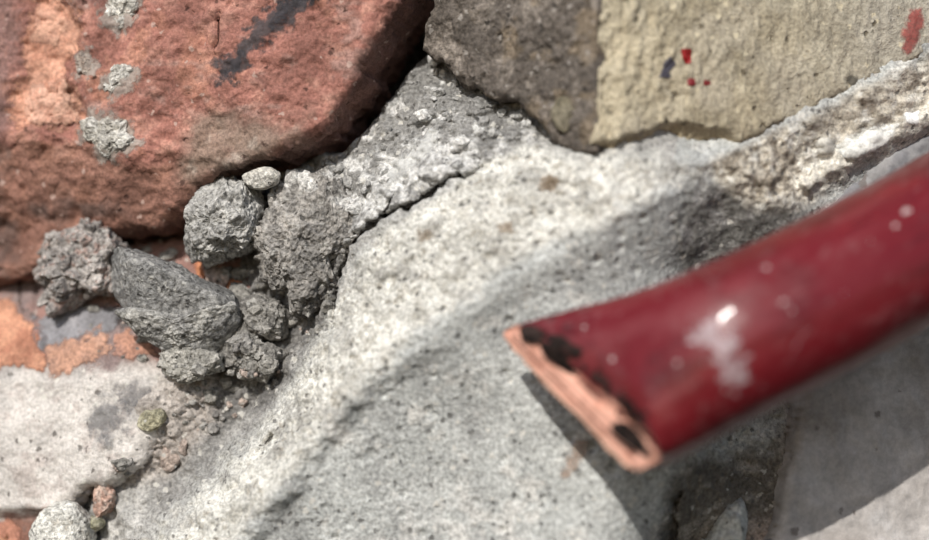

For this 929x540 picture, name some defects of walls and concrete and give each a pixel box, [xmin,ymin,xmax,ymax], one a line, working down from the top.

crack [333,174,469,309]
spalling [0,295,159,378]